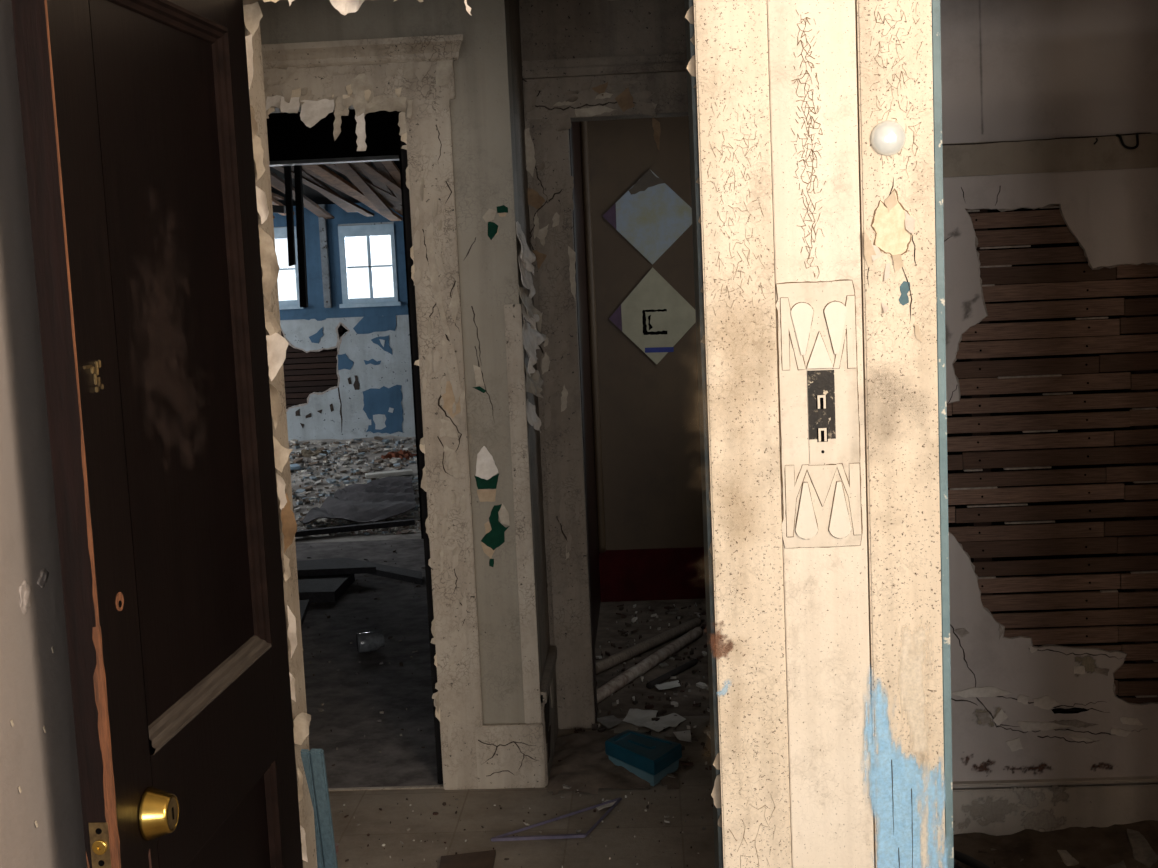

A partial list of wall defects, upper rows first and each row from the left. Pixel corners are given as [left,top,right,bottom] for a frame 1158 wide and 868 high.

peeling [685,6,696,88]
peeling [243,0,413,582]
peeling [463,128,576,433]
crack [413,88,467,665]
peeling [474,446,510,567]
spalling [947,204,1158,752]
peeling [287,605,297,657]
peeling [289,672,311,745]
crack [448,723,535,776]
peeling [711,753,722,827]
peeling [864,625,948,868]
crack [950,624,1020,727]